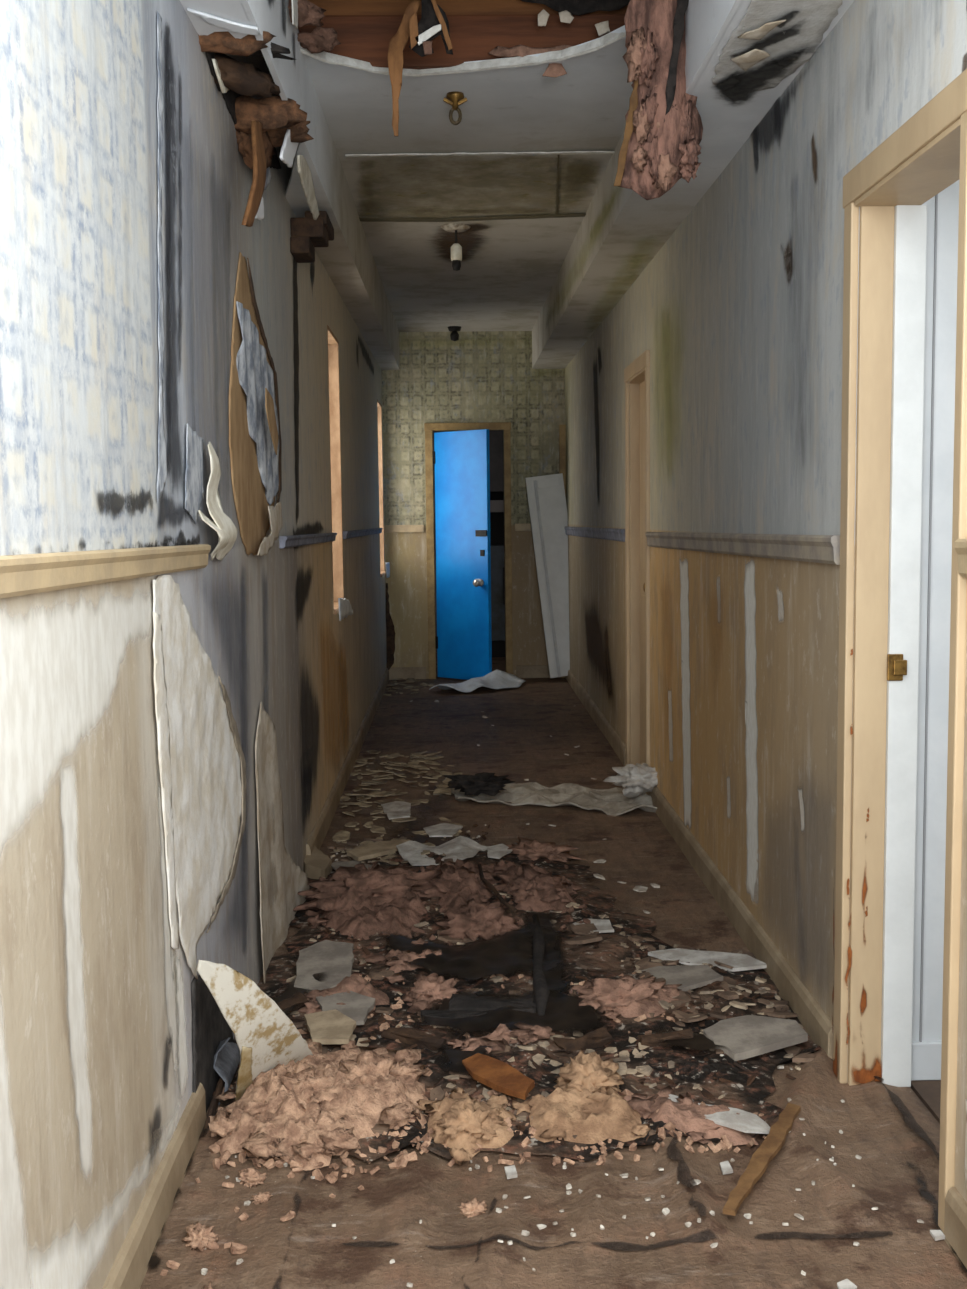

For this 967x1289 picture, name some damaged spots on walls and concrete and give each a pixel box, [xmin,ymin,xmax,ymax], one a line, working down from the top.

flaking render [538,9,574,26]
flaking render [595,21,610,36]
peeling [712,0,842,92]
spalling [187,8,319,227]
leakage [98,26,200,549]
peeling [265,388,279,455]
peeling [198,510,230,561]
peeling [0,575,246,1174]
peeling [0,1008,30,1289]